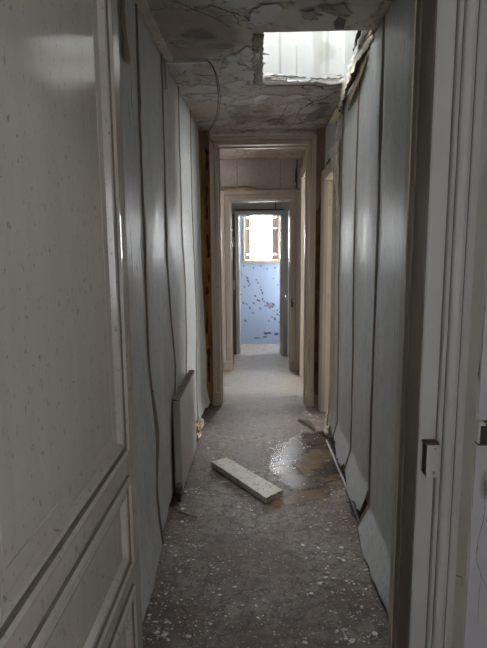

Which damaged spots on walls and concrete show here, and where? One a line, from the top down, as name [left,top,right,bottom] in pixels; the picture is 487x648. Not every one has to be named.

peeling [213,0,344,107]
crack [239,46,341,126]